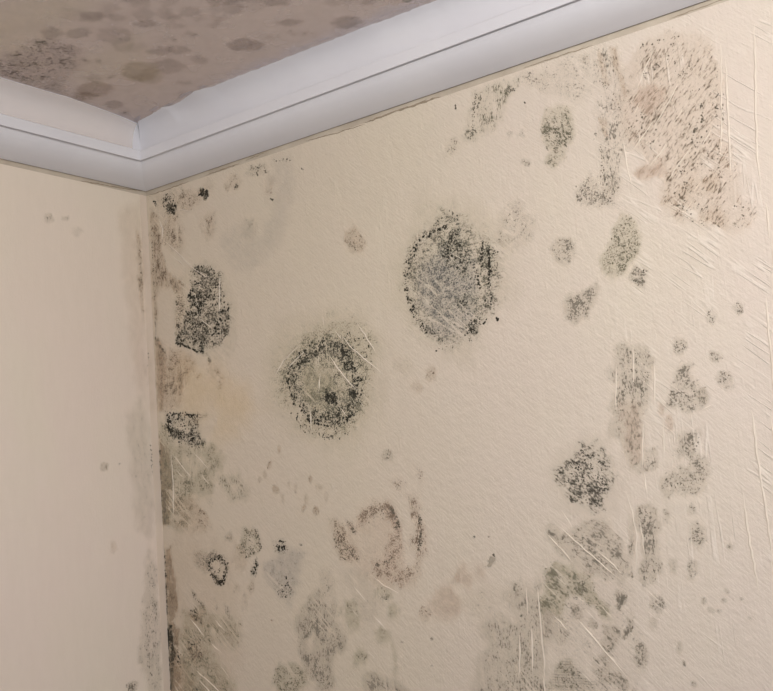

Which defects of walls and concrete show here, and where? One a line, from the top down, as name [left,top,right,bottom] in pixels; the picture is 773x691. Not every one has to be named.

water stain [465,72,537,139]
water stain [541,106,573,167]
water stain [576,36,729,227]
water stain [403,210,515,352]
water stain [138,188,243,527]
water stain [275,322,373,440]
water stain [612,348,656,471]
water stain [662,433,705,494]
water stain [667,366,706,411]
water stain [142,547,241,691]
water stain [359,498,426,585]
water stain [480,444,666,691]